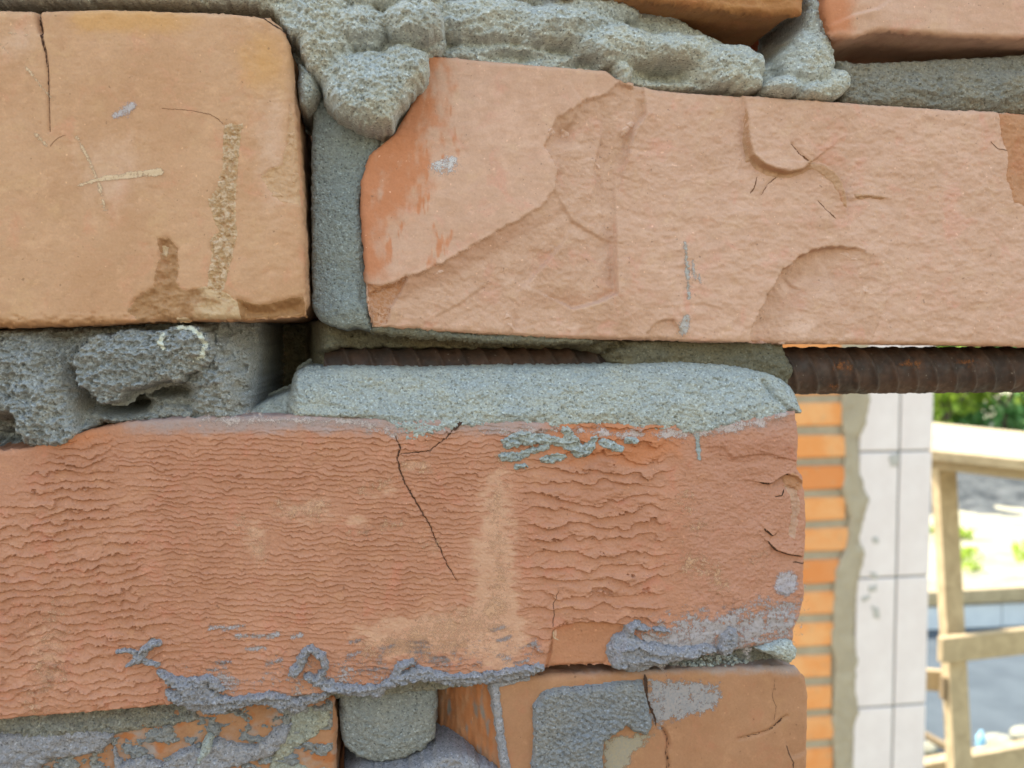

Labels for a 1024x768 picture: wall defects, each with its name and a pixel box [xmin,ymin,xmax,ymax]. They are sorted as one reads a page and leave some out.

crack [39,17,65,147]
spalling [128,110,308,323]
spalling [367,82,683,342]
spalling [751,246,891,345]
crack [396,421,462,580]
crack [643,674,669,768]
crack [747,680,794,768]